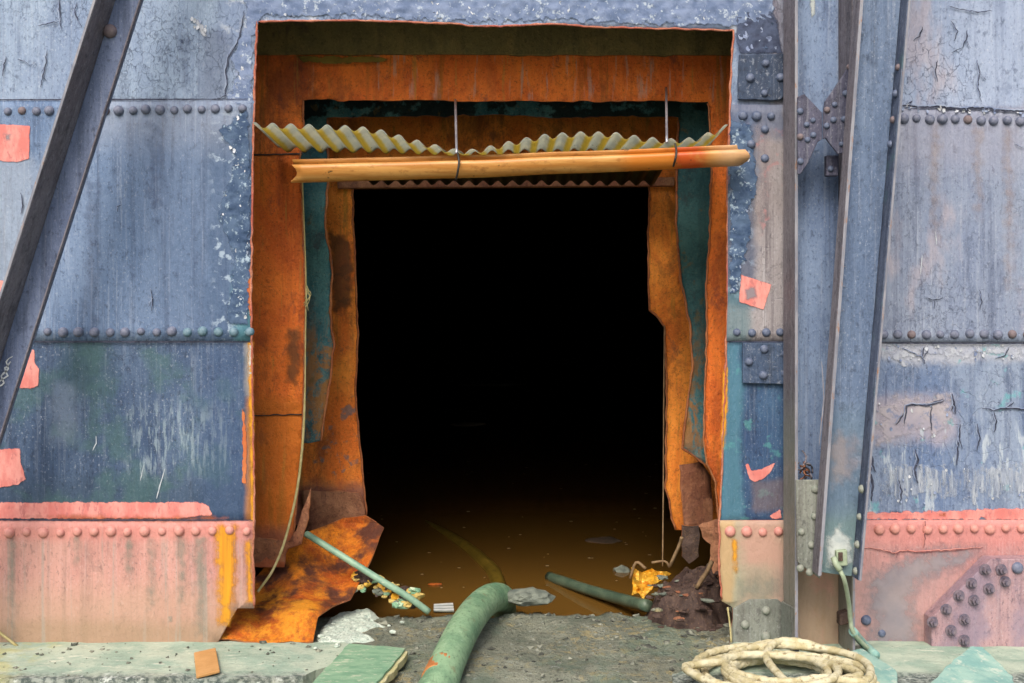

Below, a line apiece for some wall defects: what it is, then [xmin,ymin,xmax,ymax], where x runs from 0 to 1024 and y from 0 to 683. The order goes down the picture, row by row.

crack [216,10,244,99]
crack [902,6,1024,117]
rust [329,232,353,312]
rust [287,330,300,383]
crack [896,393,1024,463]
rust [205,515,384,643]